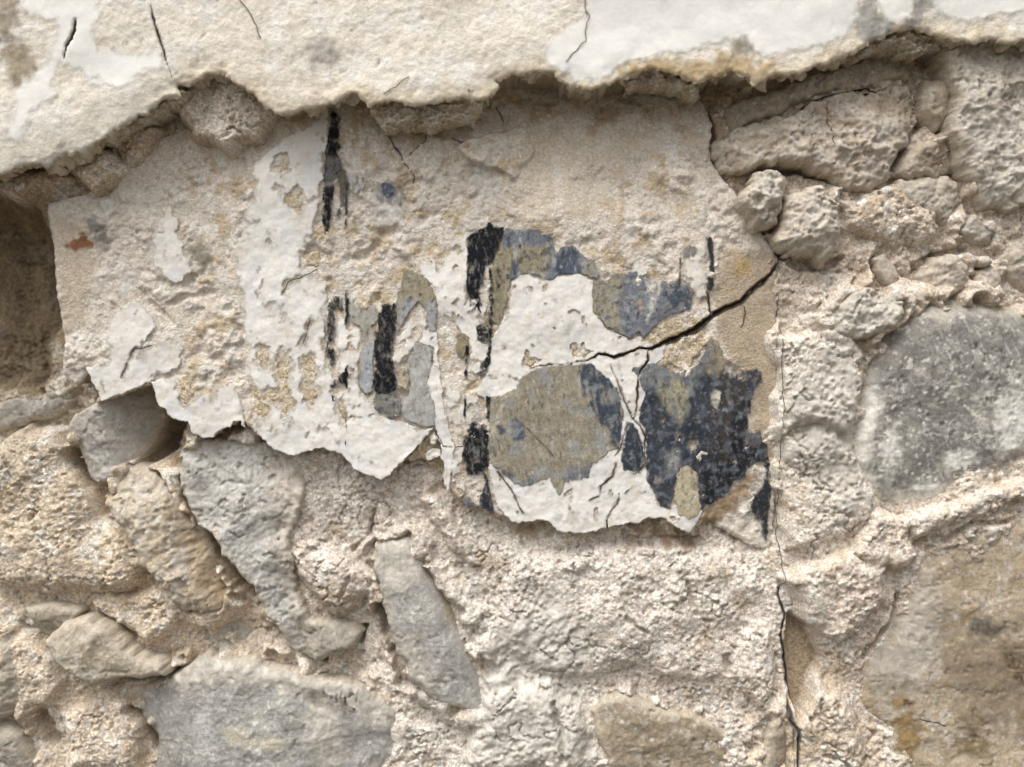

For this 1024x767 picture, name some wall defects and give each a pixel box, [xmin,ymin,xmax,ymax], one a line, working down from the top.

crack [63,20,77,59]
crack [150,4,172,77]
crack [566,0,590,62]
spalling [106,88,193,150]
spalling [370,88,487,137]
peeling [86,109,771,539]
crack [531,261,801,767]